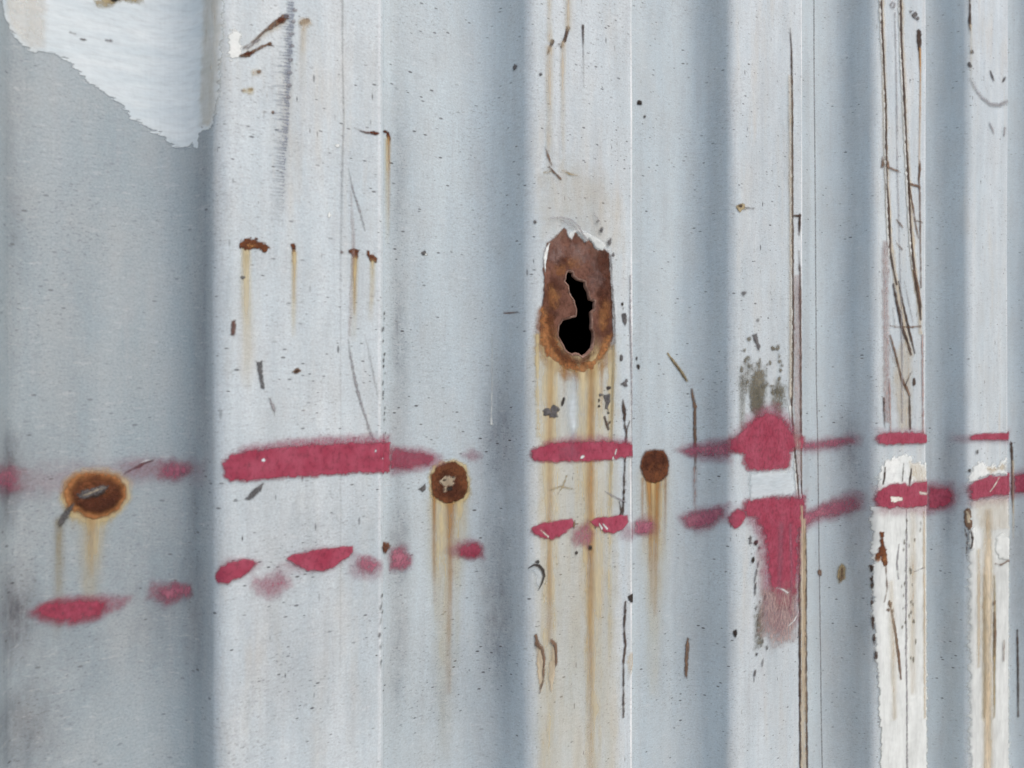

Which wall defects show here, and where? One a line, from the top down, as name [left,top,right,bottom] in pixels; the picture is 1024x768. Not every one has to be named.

peeling [2,0,224,149]
corrosion [239,237,270,305]
corrosion [349,249,377,280]
corrosion [58,470,130,551]
corrosion [429,460,470,556]
corrosion [640,450,669,545]
peeling [868,454,929,768]
peeling [964,450,1010,768]